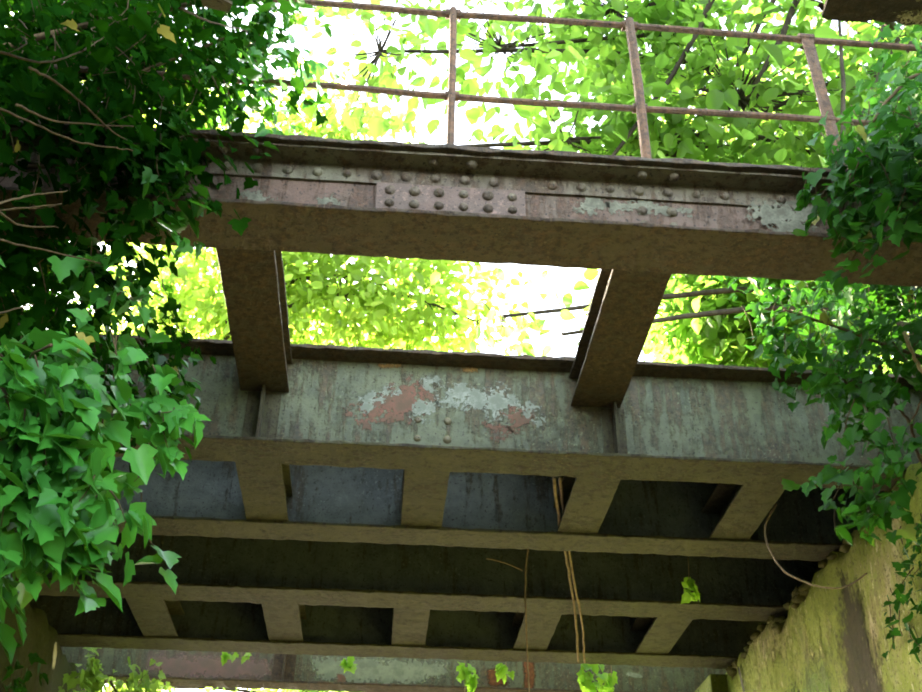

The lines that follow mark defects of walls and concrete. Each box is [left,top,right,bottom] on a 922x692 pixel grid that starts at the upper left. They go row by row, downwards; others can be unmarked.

peeling [341,374,546,444]
leakage [834,567,883,692]